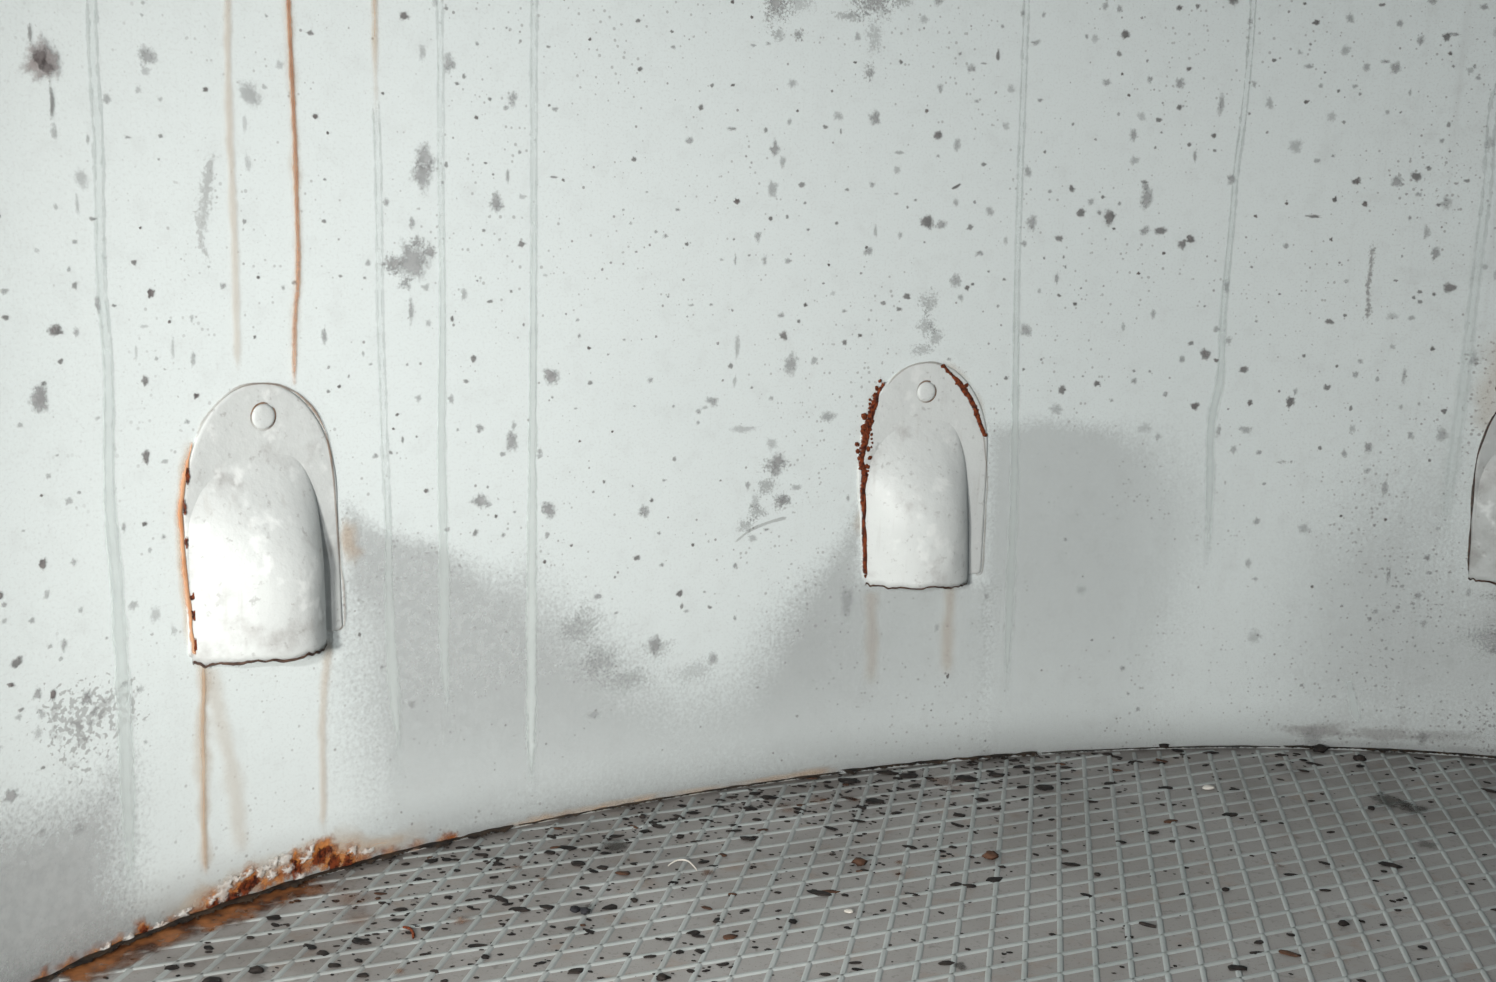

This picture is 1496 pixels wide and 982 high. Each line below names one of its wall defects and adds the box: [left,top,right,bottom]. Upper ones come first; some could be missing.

corrosion [287,0,300,286]
corrosion [178,444,197,654]
corrosion [855,379,885,578]
corrosion [941,364,987,437]
corrosion [38,838,358,982]